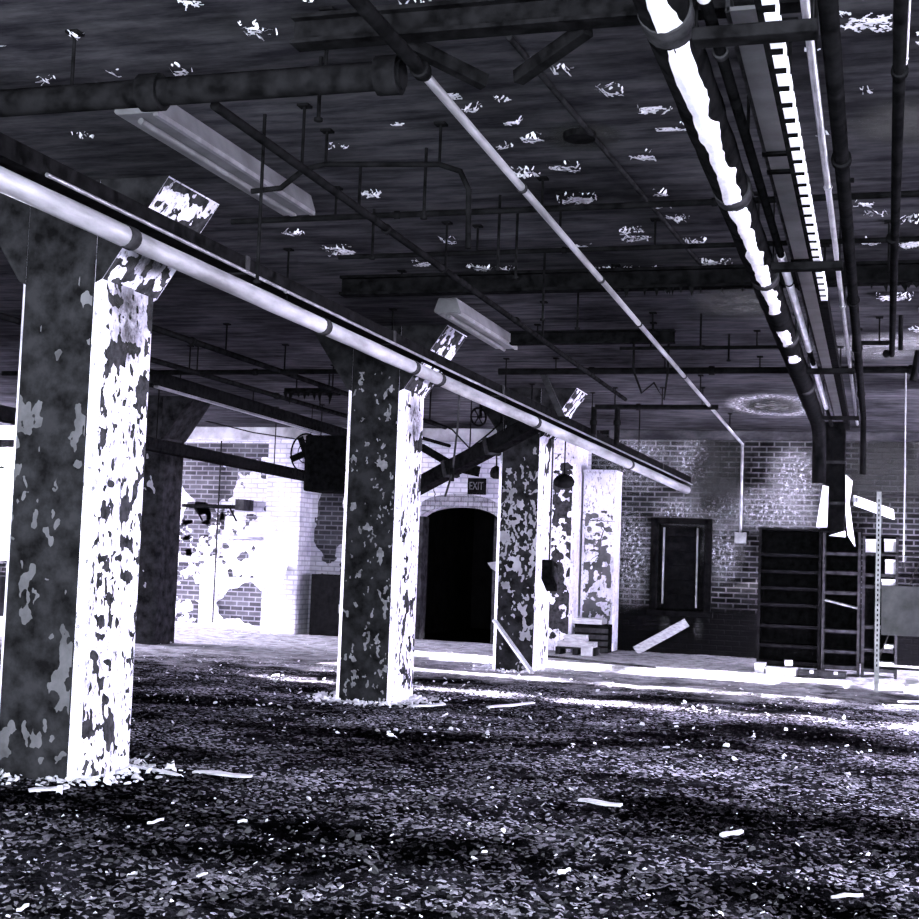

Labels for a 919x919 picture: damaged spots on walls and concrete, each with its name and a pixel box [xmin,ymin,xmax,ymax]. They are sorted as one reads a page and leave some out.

peeling [839,11,892,33]
peeling [135,266,170,334]
peeling [100,332,141,418]
peeling [119,369,155,556]
peeling [184,442,269,461]
peeling [176,458,252,623]
peeling [216,582,262,626]
peeling [398,587,416,690]
peeling [500,480,537,577]
peeling [543,433,573,640]
peeling [582,534,611,624]
peeling [81,693,118,754]